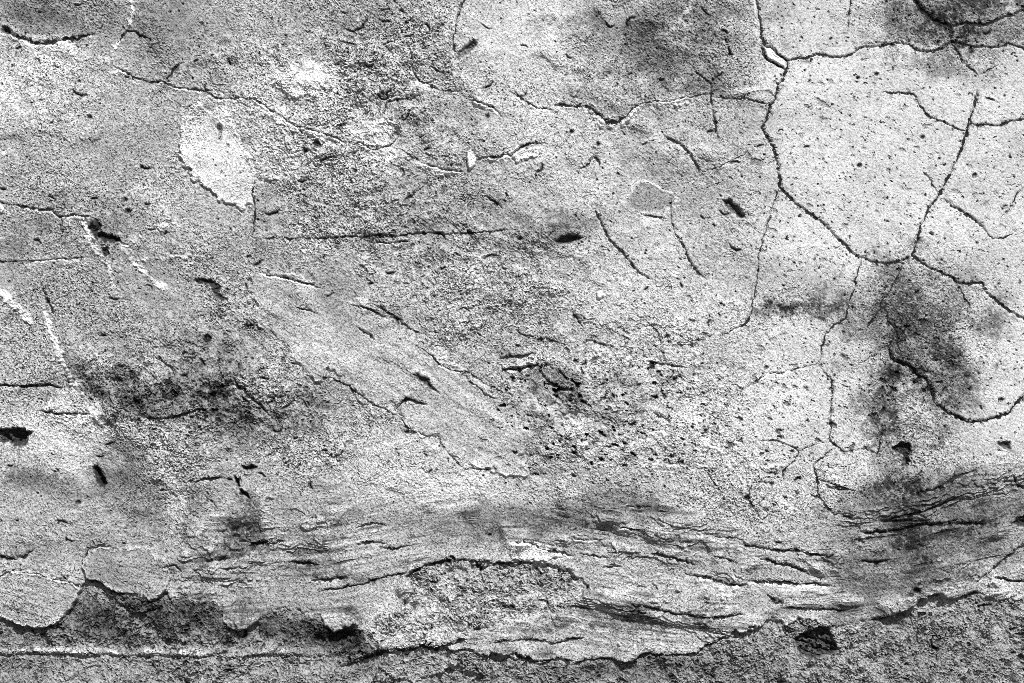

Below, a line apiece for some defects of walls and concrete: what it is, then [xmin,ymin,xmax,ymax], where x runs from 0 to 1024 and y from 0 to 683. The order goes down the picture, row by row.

crack [1,30,541,244]
crack [259,272,319,313]
crack [357,0,1024,520]
flaking render [111,452,1024,683]